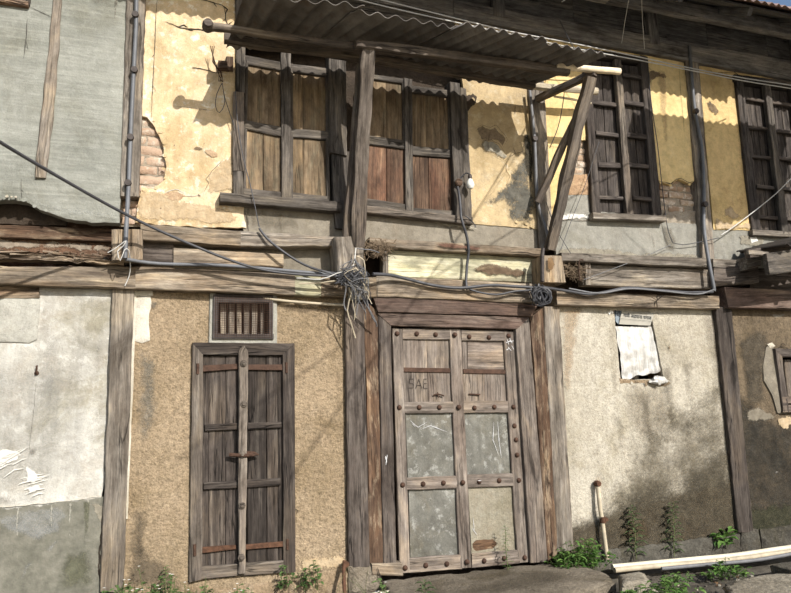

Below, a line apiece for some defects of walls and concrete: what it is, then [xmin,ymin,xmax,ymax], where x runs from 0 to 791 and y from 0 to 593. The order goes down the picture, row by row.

crack [151,0,231,117]
flaking render [0,195,68,227]
peeling [119,118,237,227]
peeling [477,125,508,161]
flaking render [562,141,590,221]
flaking render [659,178,696,224]
peeling [778,416,791,429]
peeling [26,466,40,493]
water stain [570,387,739,562]
water stain [0,496,110,593]